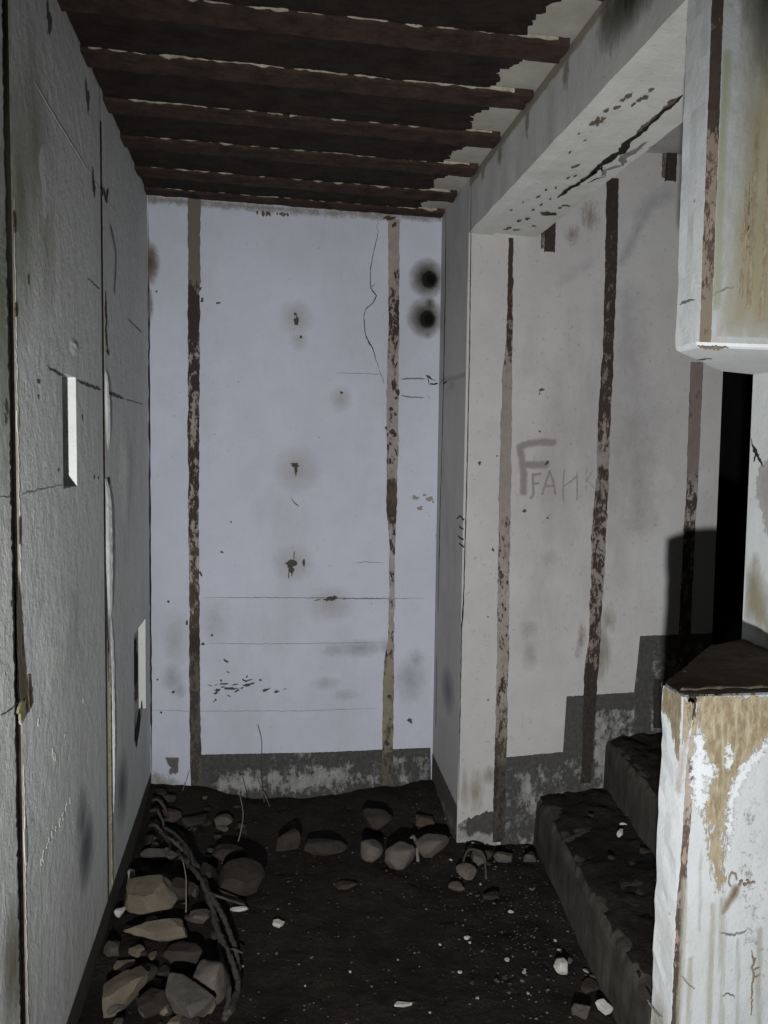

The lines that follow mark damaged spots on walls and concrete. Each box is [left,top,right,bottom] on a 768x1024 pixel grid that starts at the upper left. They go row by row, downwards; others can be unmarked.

peeling [577,89,654,141]
crack [543,95,683,216]
spalling [602,142,647,176]
peeling [503,164,587,231]
crack [352,222,471,748]